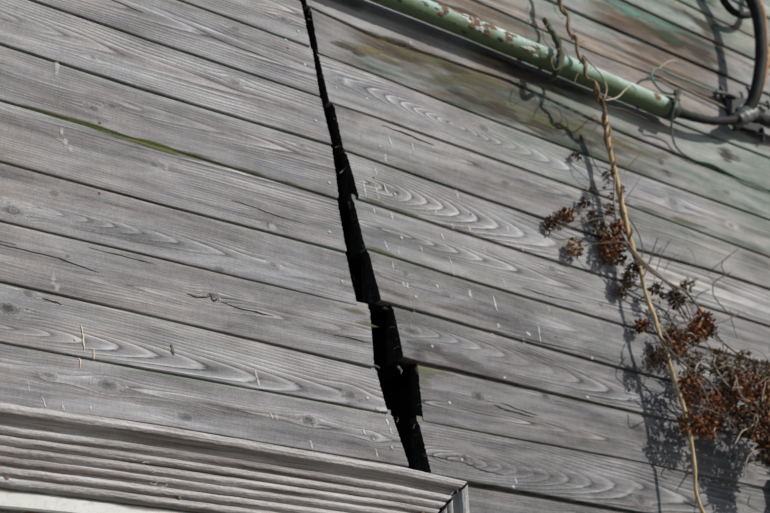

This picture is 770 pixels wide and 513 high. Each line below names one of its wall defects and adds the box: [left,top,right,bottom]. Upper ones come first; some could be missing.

crack [300,0,431,473]
rust [437,4,514,46]